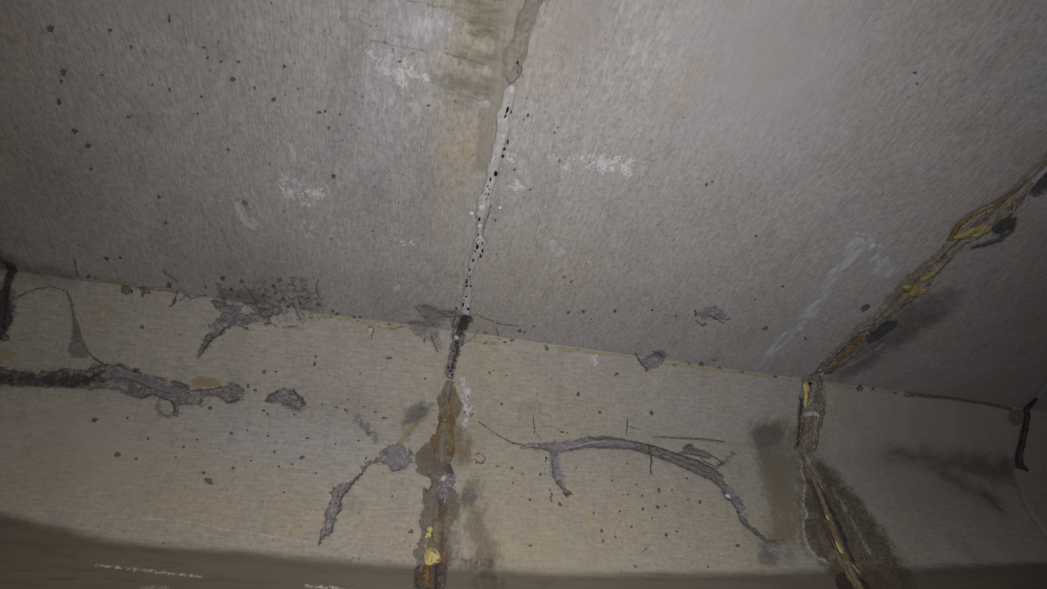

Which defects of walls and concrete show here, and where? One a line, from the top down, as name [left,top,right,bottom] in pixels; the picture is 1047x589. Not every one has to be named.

crack [0,260,107,366]
crack [162,270,205,307]
spalling [198,280,317,358]
spalling [265,388,306,411]
crack [318,442,413,546]
corrosion [429,380,471,464]
crack [479,417,553,502]
leakage [0,140,1047,589]
crack [904,392,1039,472]